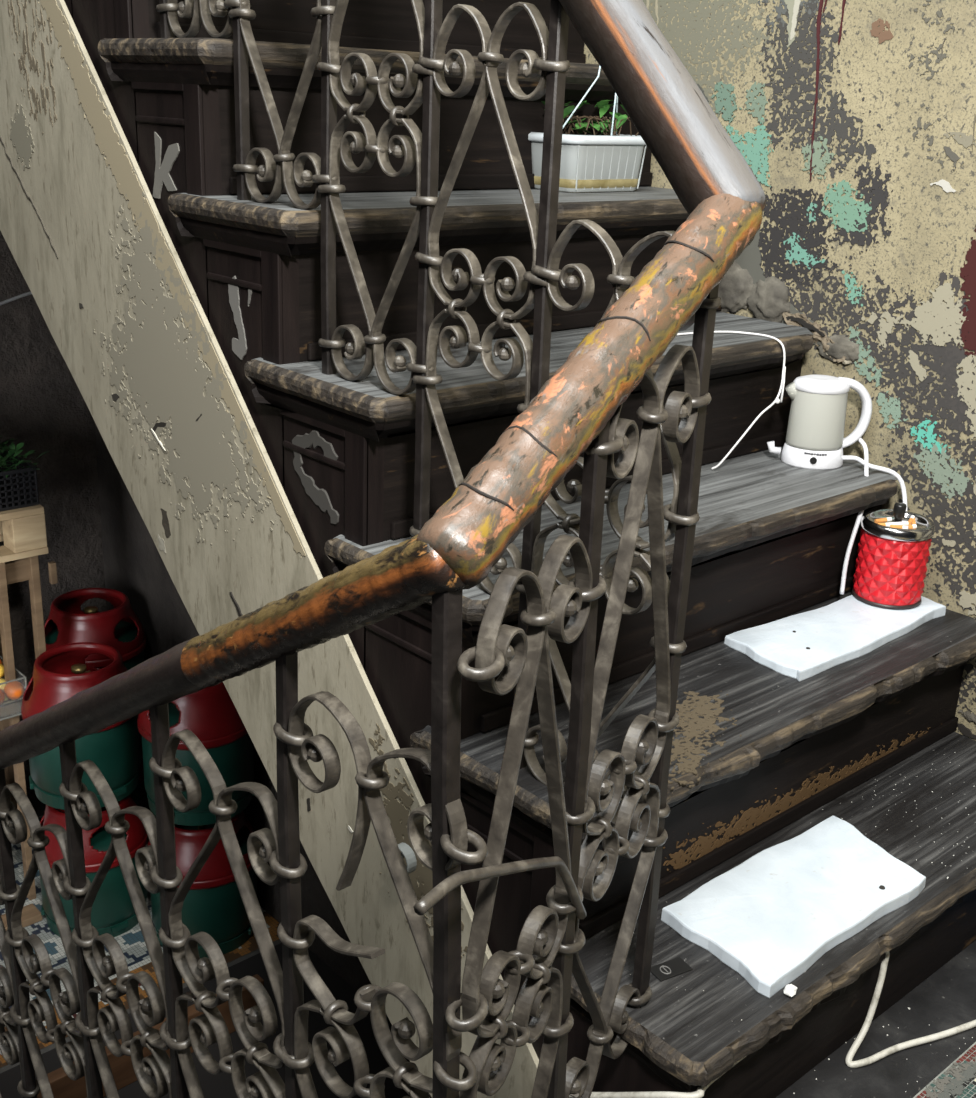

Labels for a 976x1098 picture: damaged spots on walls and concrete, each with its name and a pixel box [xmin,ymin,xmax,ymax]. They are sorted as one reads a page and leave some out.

peeling [8,0,57,135]
crack [0,136,59,258]
peeling [753,0,976,620]
spalling [158,508,171,554]
peeling [957,660,976,723]